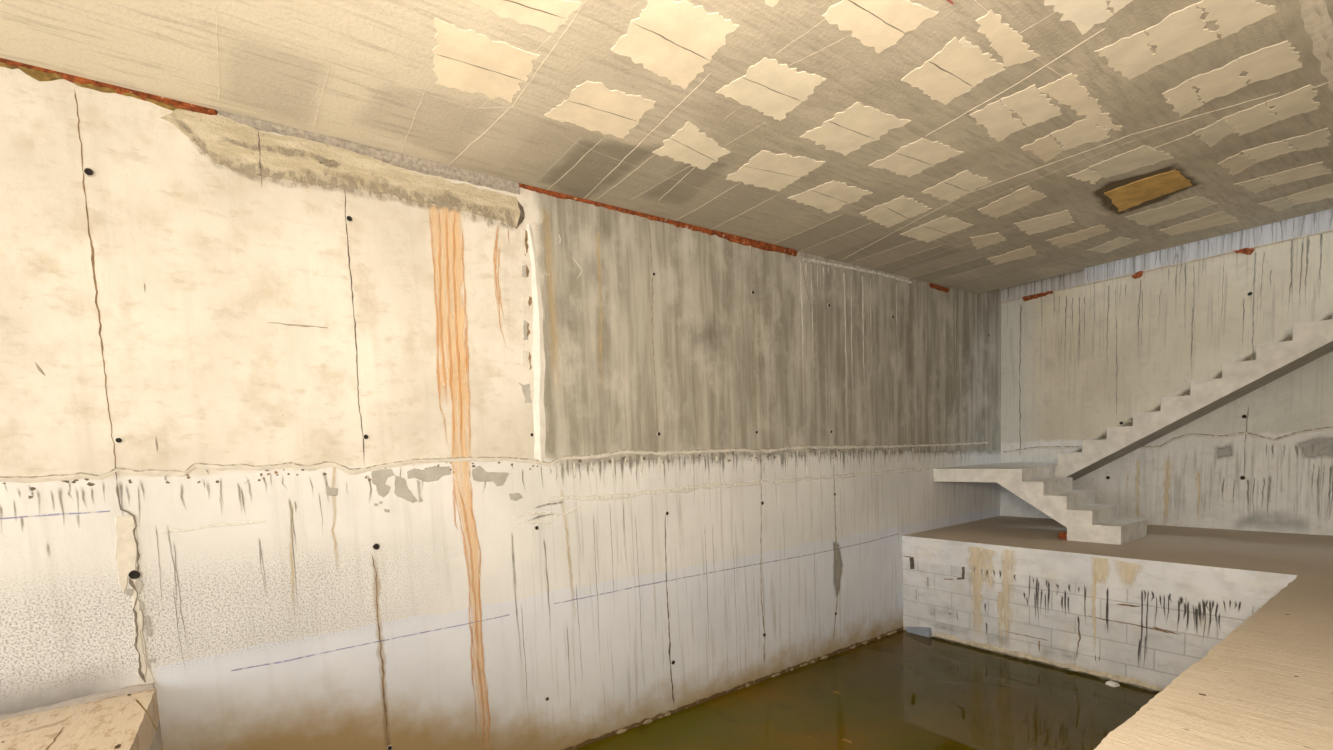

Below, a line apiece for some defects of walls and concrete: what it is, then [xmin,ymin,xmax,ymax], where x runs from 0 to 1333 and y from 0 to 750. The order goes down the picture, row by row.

spalling [0,58,798,278]
peeling [519,296,532,403]
damp [540,193,1243,481]
rust [430,205,490,735]
damp [156,530,185,644]
damp [973,547,1109,634]
damp [1138,591,1241,660]